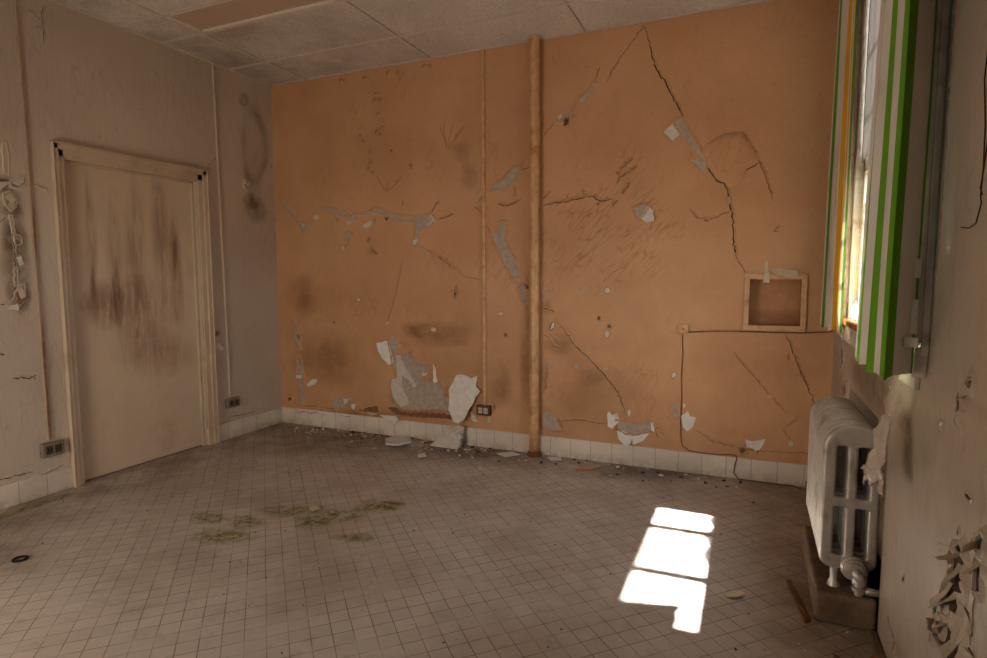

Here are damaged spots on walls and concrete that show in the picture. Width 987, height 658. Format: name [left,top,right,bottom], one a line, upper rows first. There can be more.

peeling [313,201,454,255]
peeling [474,192,529,306]
crack [497,157,638,208]
peeling [664,116,708,171]
crack [606,24,774,272]
peeling [287,316,481,446]
crack [557,321,626,414]
peeling [540,408,656,446]
crack [694,333,817,455]
peeling [926,524,987,658]